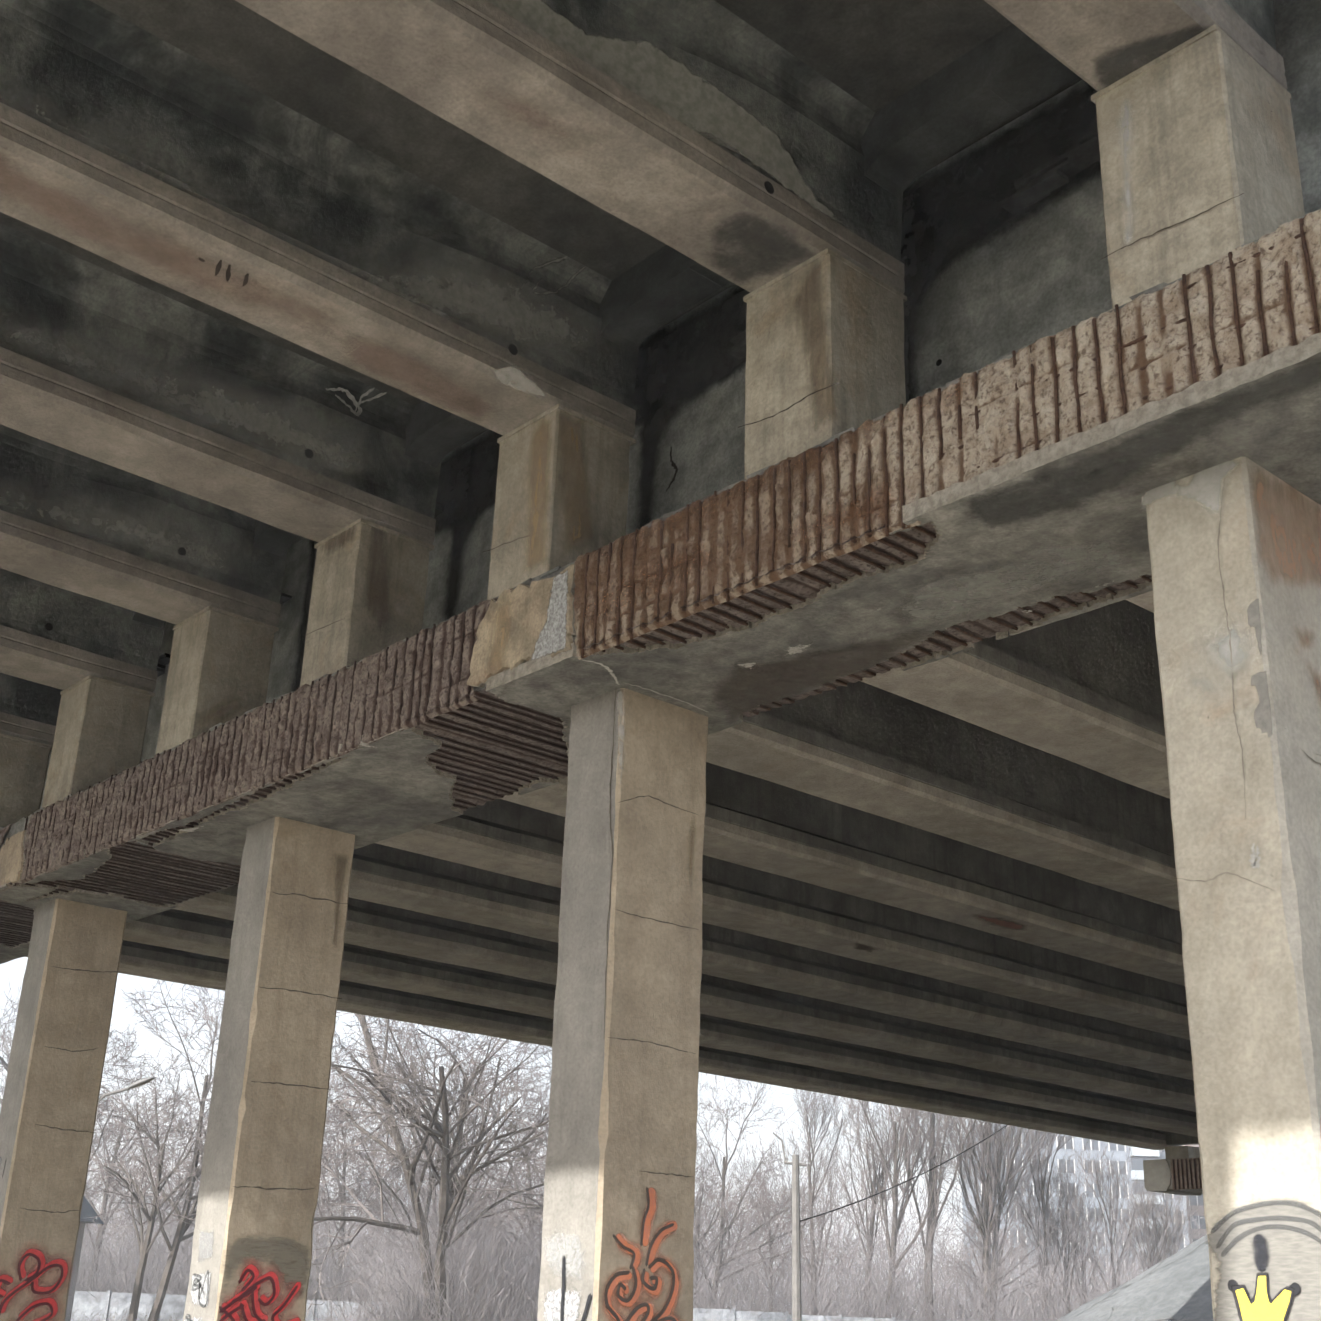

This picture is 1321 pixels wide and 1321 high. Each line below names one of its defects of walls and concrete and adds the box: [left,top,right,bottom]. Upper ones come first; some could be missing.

leakage [713,216,834,417]
crack [738,383,839,428]
spalling [531,209,1321,660]
spalling [0,597,569,947]
crack [583,660,708,1054]
spalling [740,574,1152,717]
crack [1175,872,1273,891]
crack [1217,478,1246,818]
peeling [1251,671,1273,737]